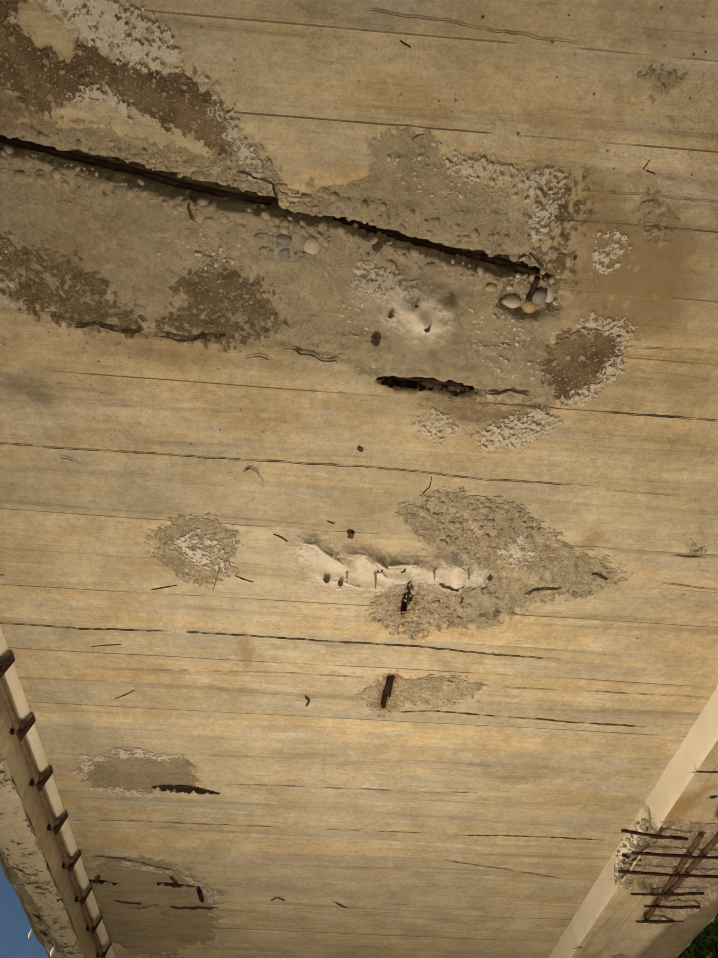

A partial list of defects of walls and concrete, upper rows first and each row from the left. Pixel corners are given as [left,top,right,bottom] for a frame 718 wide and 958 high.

damp [0,0,273,187]
crack [0,134,279,222]
damp [0,231,292,361]
spalling [0,108,575,407]
crack [334,217,552,279]
damp [410,152,685,455]
crack [377,376,529,397]
spalling [144,510,244,591]
spalling [362,487,633,640]
spalling [356,671,484,720]
spalling [0,654,227,958]
spalling [610,795,718,926]